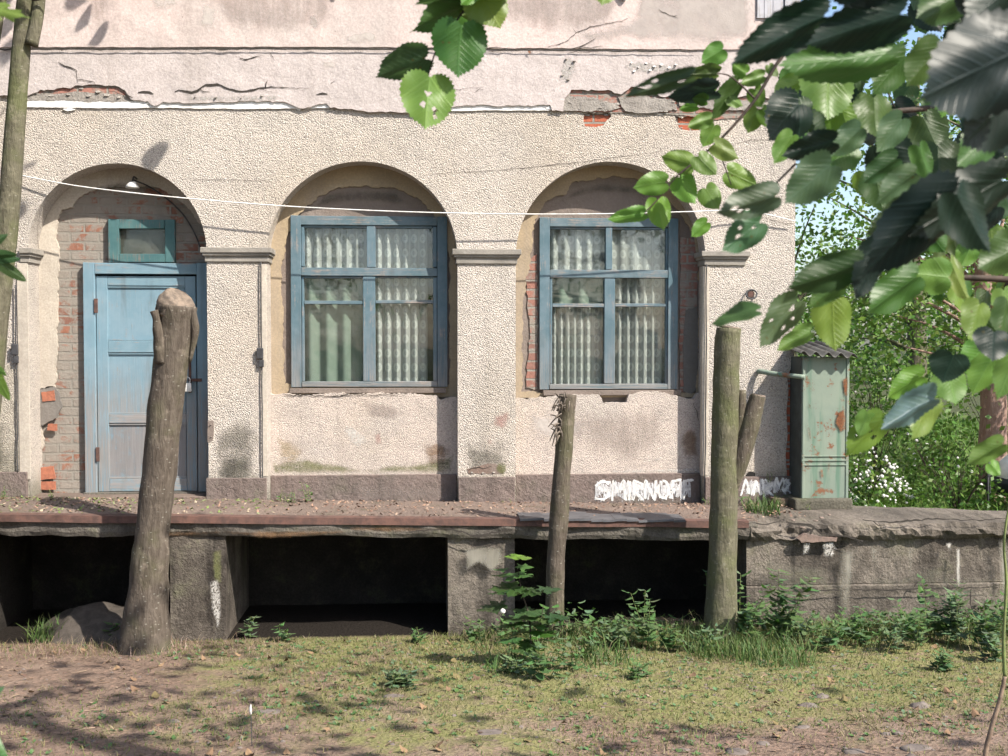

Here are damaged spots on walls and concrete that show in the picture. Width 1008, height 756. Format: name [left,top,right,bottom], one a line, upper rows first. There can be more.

crack [486,18,697,52]
flaking render [27,85,330,111]
crack [0,47,397,98]
flaking render [560,58,769,131]
flaking render [526,253,539,390]
flaking render [40,387,63,431]
rust [836,410,845,431]
flaking render [41,466,56,490]